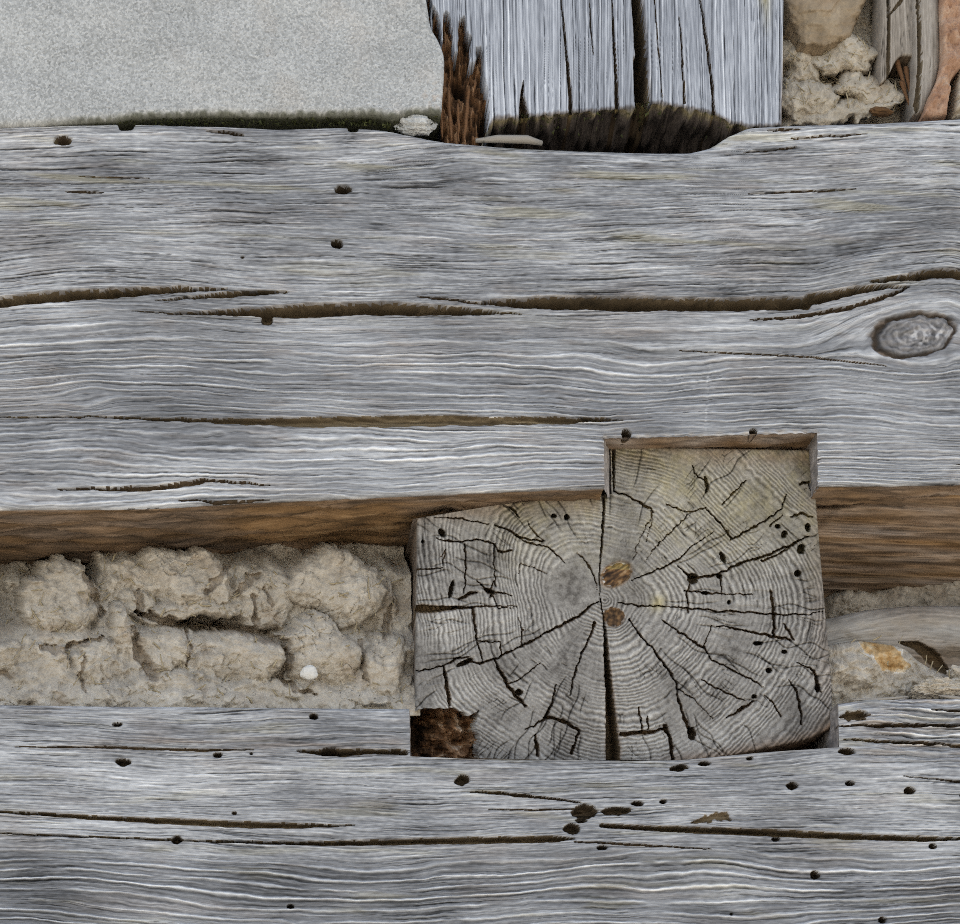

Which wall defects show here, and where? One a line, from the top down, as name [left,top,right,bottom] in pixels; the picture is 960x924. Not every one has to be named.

crack [560,0,573,151]
crack [589,0,716,153]
crack [0,269,960,326]
crack [6,415,617,428]
crack [357,449,822,760]
crack [470,790,580,811]
crack [0,810,960,849]